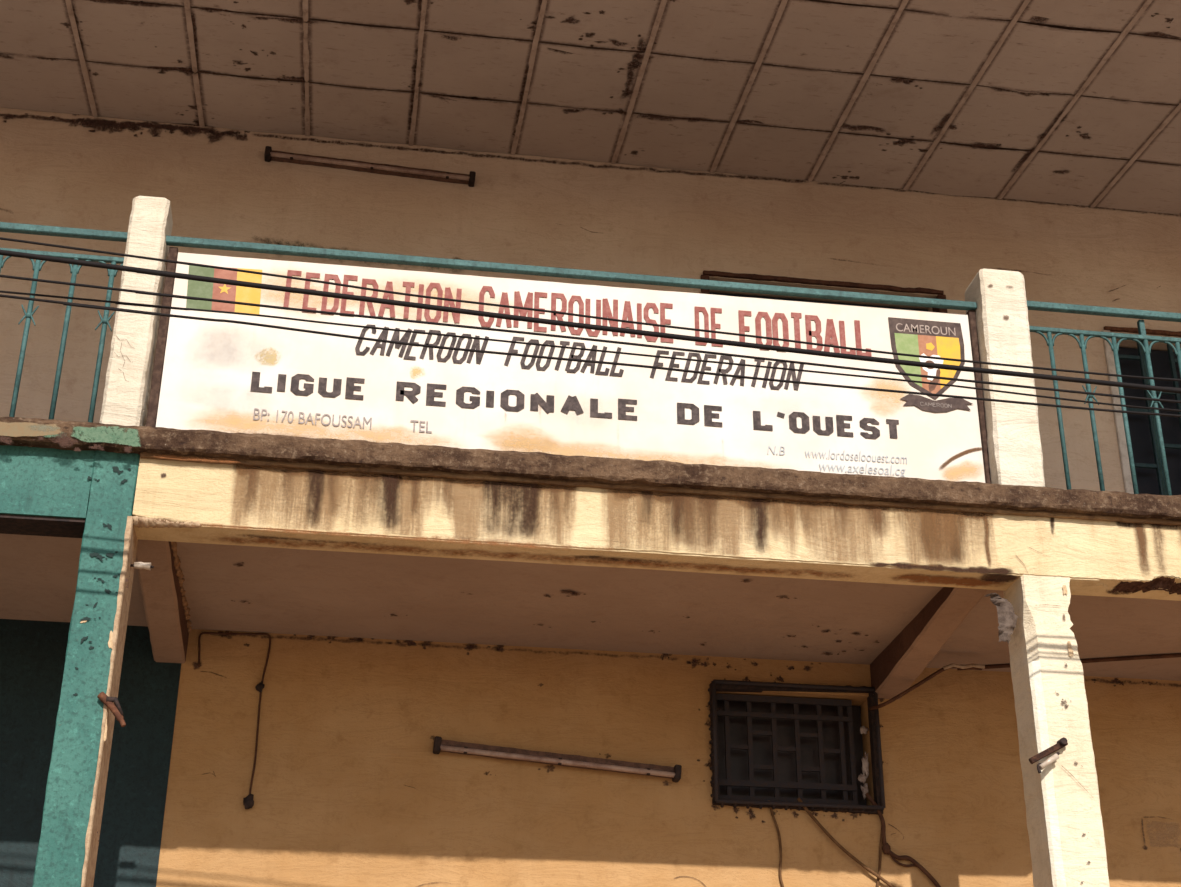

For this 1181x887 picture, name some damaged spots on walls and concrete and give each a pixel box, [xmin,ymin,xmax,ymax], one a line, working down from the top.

peeling [0,422,140,446]
leakage [234,464,575,538]
leakage [607,489,993,565]
spalling [1107,576,1181,595]